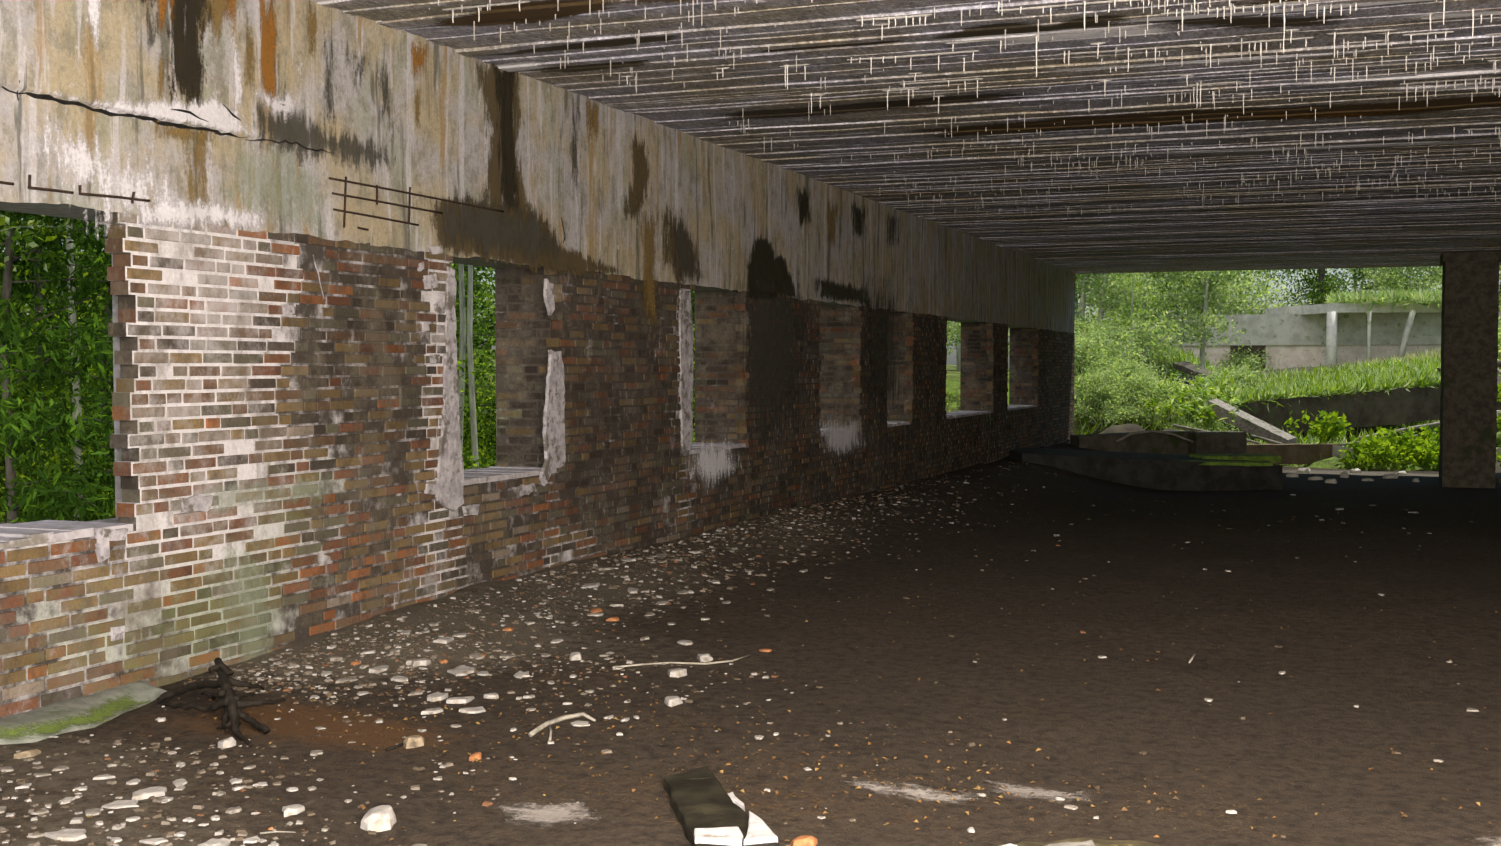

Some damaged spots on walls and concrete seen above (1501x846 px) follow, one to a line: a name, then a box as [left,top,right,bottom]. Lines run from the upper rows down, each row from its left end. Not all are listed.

water stain [86,0,101,43]
corrosion [158,0,174,28]
water stain [141,0,214,107]
corrosion [201,0,277,106]
corrosion [308,5,317,53]
spalling [0,175,150,203]
crack [2,80,330,153]
water stain [229,42,396,172]
spalling [329,177,504,231]
water stain [432,60,616,278]
water stain [624,133,702,327]
water stain [738,234,900,445]